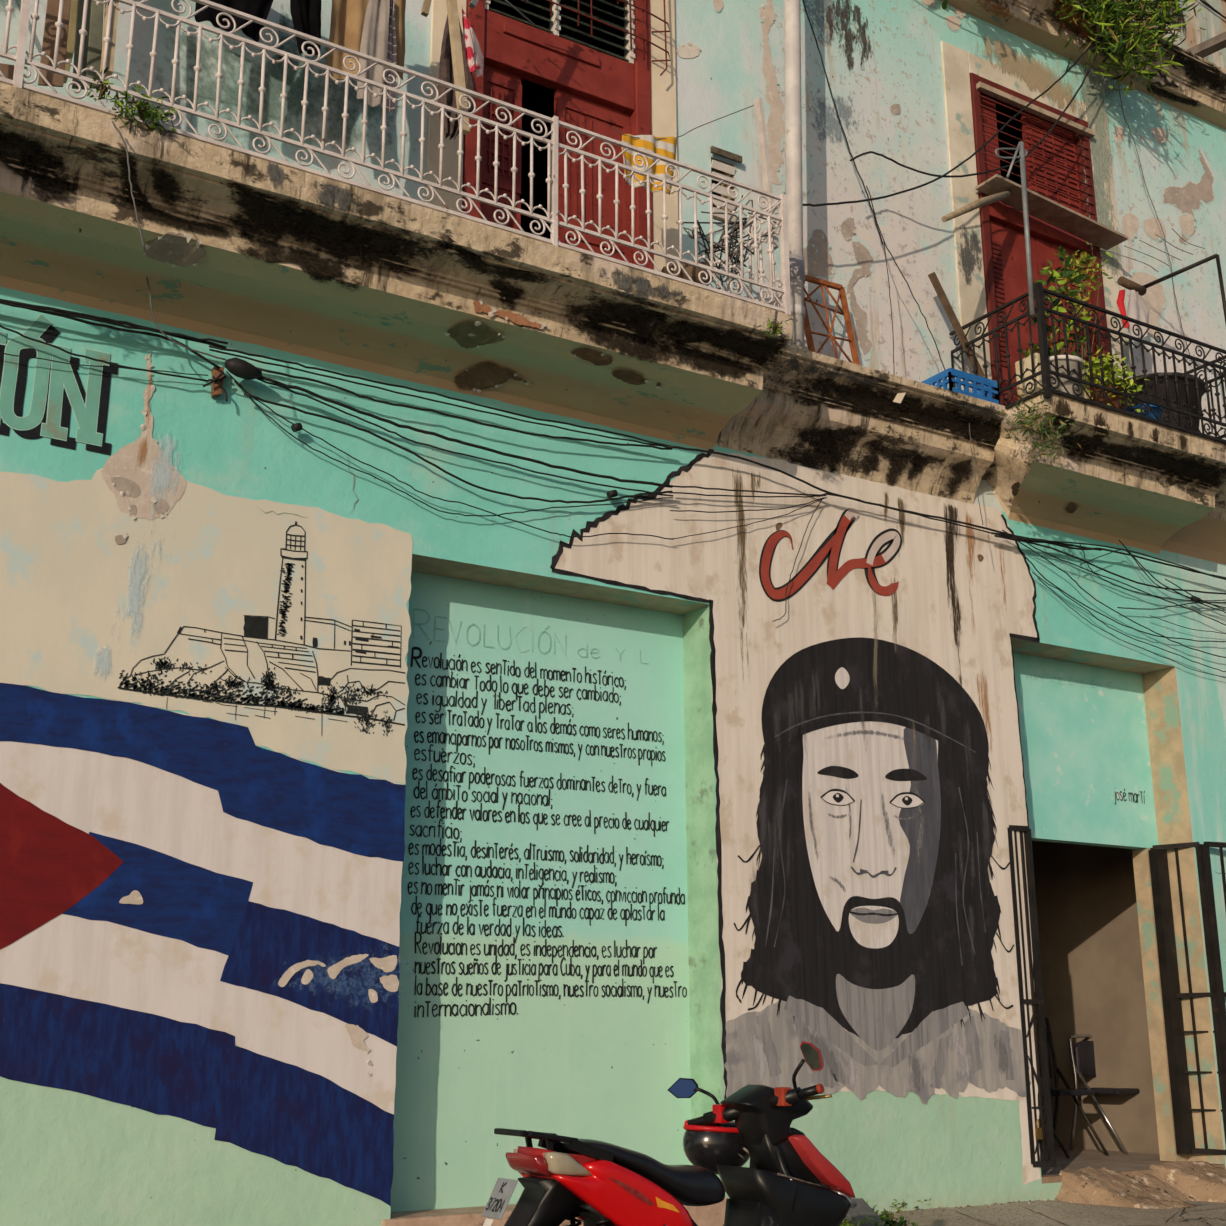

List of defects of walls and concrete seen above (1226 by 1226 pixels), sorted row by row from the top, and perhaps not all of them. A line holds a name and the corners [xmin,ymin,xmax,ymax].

damp [804,0,873,70]
damp [1142,42,1226,107]
damp [0,122,80,202]
damp [117,143,556,310]
peeling [1120,145,1216,248]
peeling [803,216,874,360]
peeling [1126,268,1167,344]
peeling [101,349,187,544]
damp [564,267,1006,686]
damp [1050,398,1226,492]
peeling [278,954,399,1003]
spalling [345,1024,372,1077]